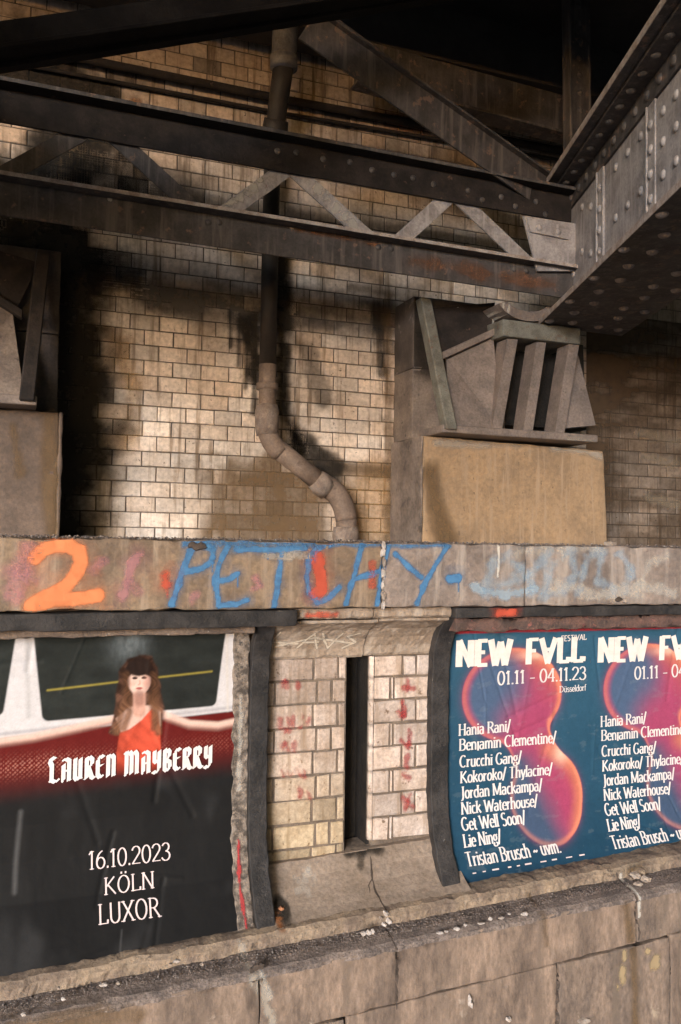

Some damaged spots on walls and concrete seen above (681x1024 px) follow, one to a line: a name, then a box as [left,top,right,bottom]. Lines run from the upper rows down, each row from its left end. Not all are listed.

damp [371,298,392,400]
crack [368,857,399,1010]